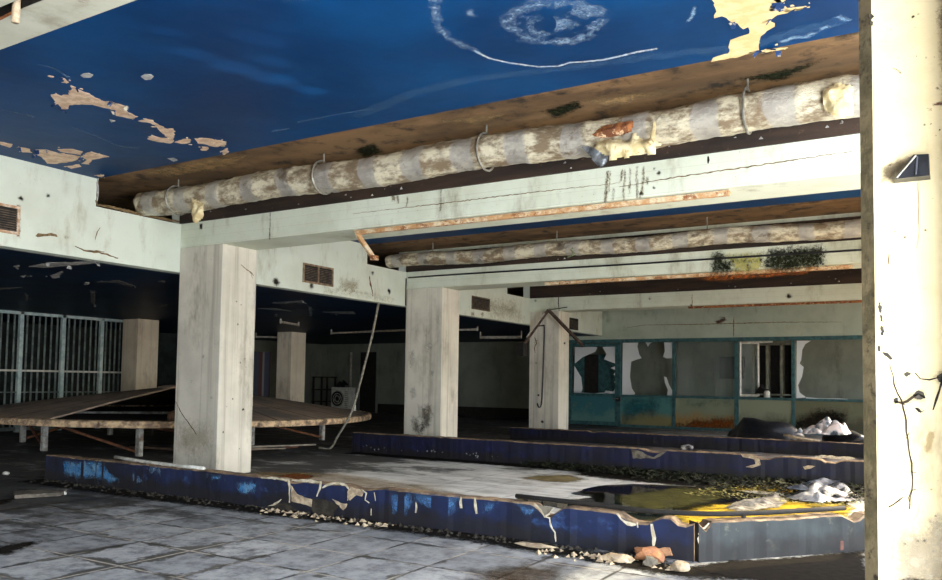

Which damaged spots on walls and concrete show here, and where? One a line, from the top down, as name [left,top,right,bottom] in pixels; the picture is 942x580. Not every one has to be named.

peeling [711,0,810,62]
peeling [48,73,229,157]
peeling [0,142,109,169]
leakage [884,162,906,178]
spalling [94,175,179,222]
leakage [710,245,825,274]
crack [888,366,942,509]
spalling [267,486,364,516]
peeling [392,495,431,511]
spalling [634,546,672,562]
leakage [899,521,942,580]
leakage [481,566,558,580]